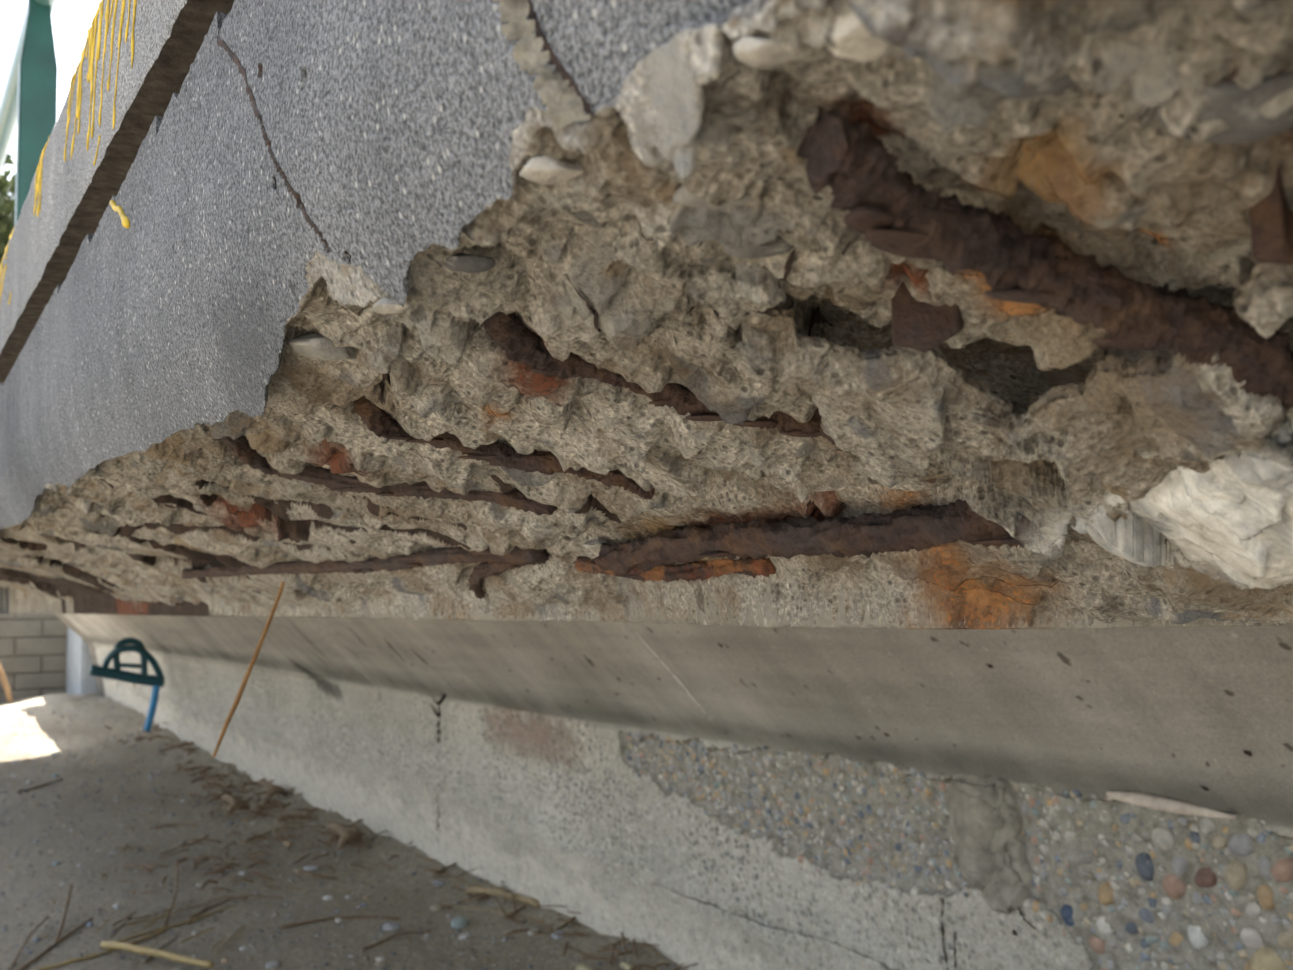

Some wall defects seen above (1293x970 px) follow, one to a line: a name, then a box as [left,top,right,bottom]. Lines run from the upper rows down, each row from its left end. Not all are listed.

crack [216,24,329,253]
rust [974,127,1106,216]
spalling [0,0,1293,628]
rust [508,359,567,403]
rust [646,491,843,536]
rust [115,598,209,616]
rust [920,544,1049,630]
flaking render [619,731,983,898]
flaking render [1006,779,1293,970]
crack [651,883,893,970]
crack [940,898,957,970]
crack [1017,908,1047,936]